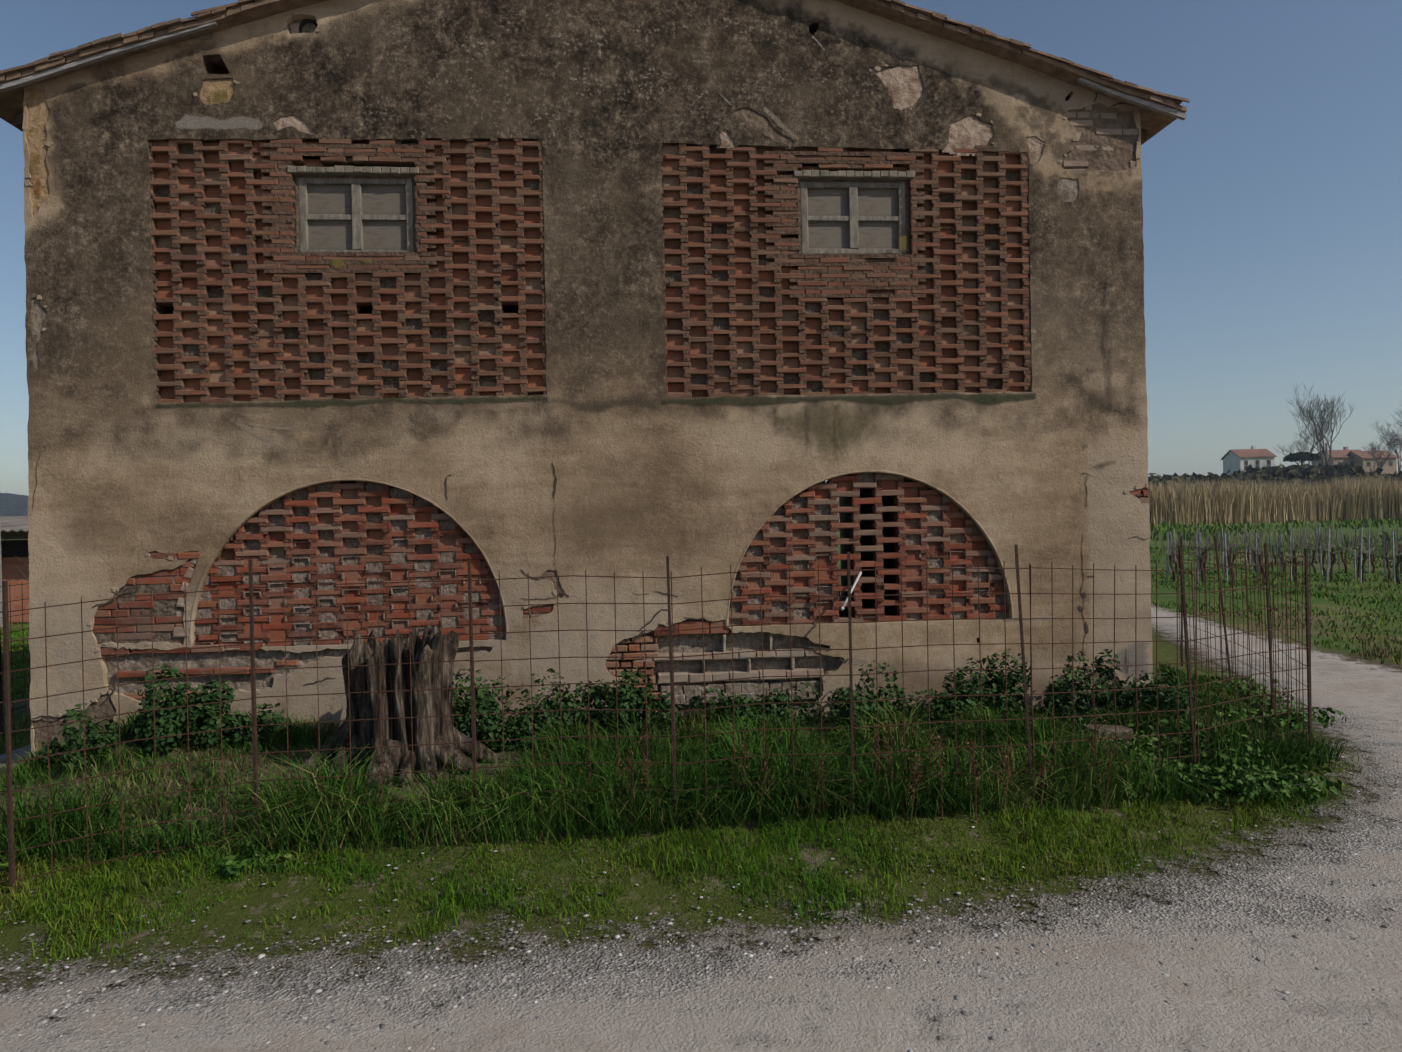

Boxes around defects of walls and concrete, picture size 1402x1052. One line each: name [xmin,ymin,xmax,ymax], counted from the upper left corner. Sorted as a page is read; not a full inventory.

spalling [193,72,240,105]
spalling [869,64,924,110]
spalling [273,115,316,135]
spalling [942,113,995,156]
spalling [1057,100,1141,202]
crack [520,463,569,600]
spalling [522,568,563,619]
spalling [30,551,350,756]
spalling [605,619,842,718]